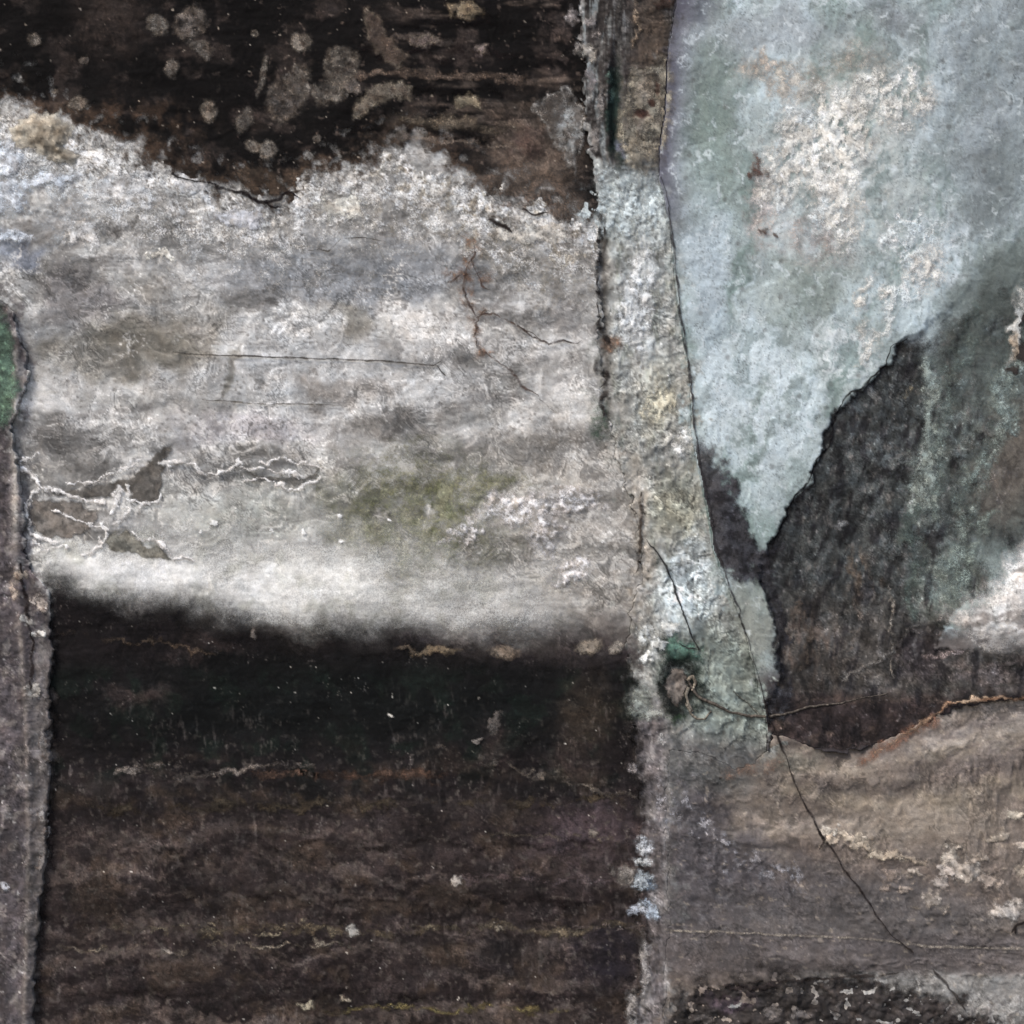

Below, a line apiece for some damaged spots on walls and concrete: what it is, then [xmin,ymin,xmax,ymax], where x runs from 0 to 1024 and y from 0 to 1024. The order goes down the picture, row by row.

crack [171,173,301,209]
damp [0,0,670,306]
crack [174,352,446,376]
crack [450,203,618,416]
peeling [20,446,322,562]
crack [636,492,700,650]
damp [670,427,795,723]
crack [661,177,1024,1010]
damp [31,522,692,1024]
damp [691,818,736,853]
damp [750,850,804,880]
corrosion [861,695,1024,764]